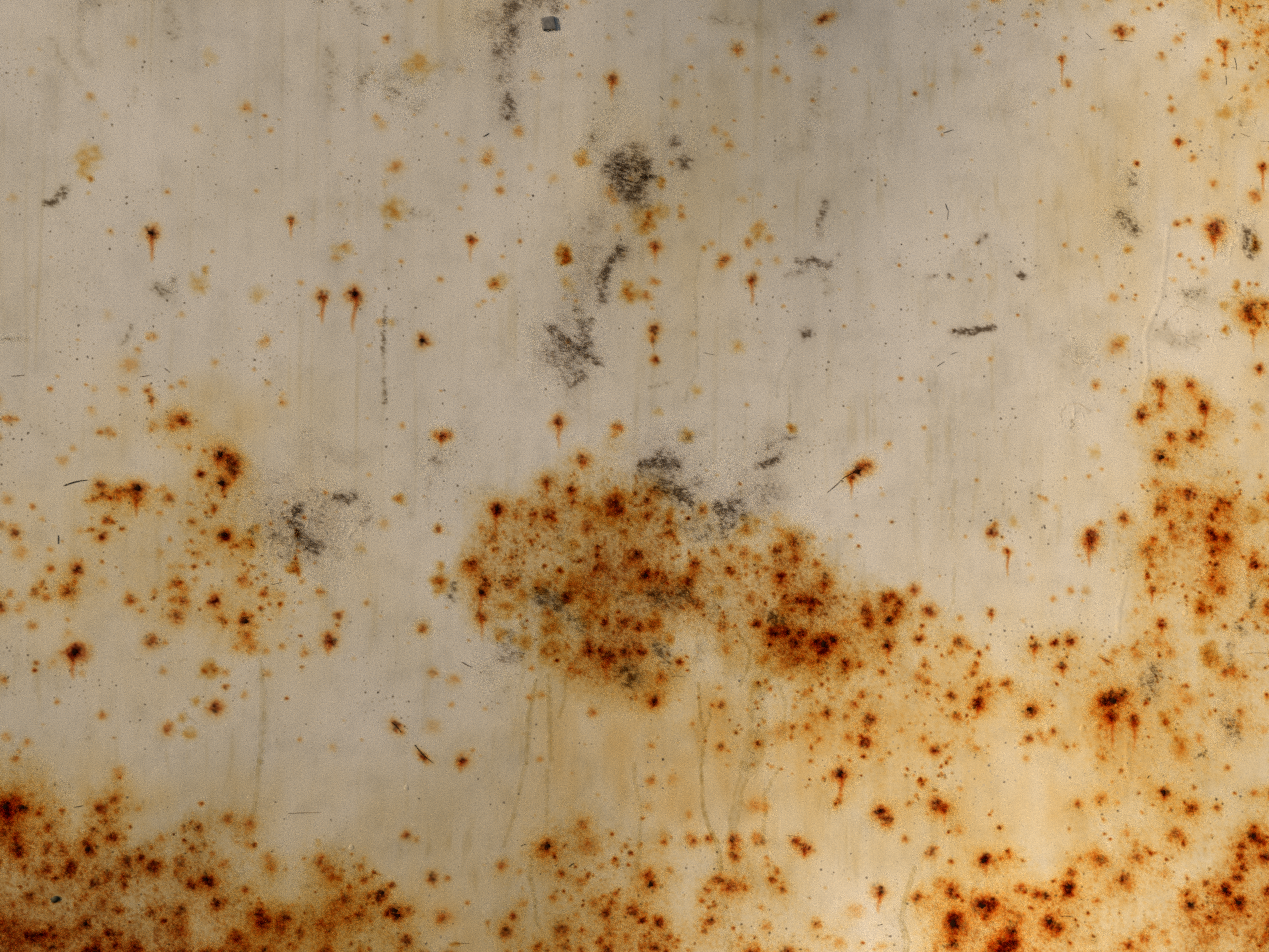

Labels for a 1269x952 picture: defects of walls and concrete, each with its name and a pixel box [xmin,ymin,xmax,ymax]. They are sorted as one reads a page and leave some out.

damp [491,0,556,58]
damp [601,143,659,226]
damp [557,248,571,264]
damp [596,245,625,303]
damp [543,308,603,387]
rust [543,492,705,675]
rust [712,537,861,691]
rust [1098,689,1148,725]
rust [0,796,305,952]
rust [944,885,1023,952]
rust [1019,869,1089,944]
rust [1185,825,1269,947]